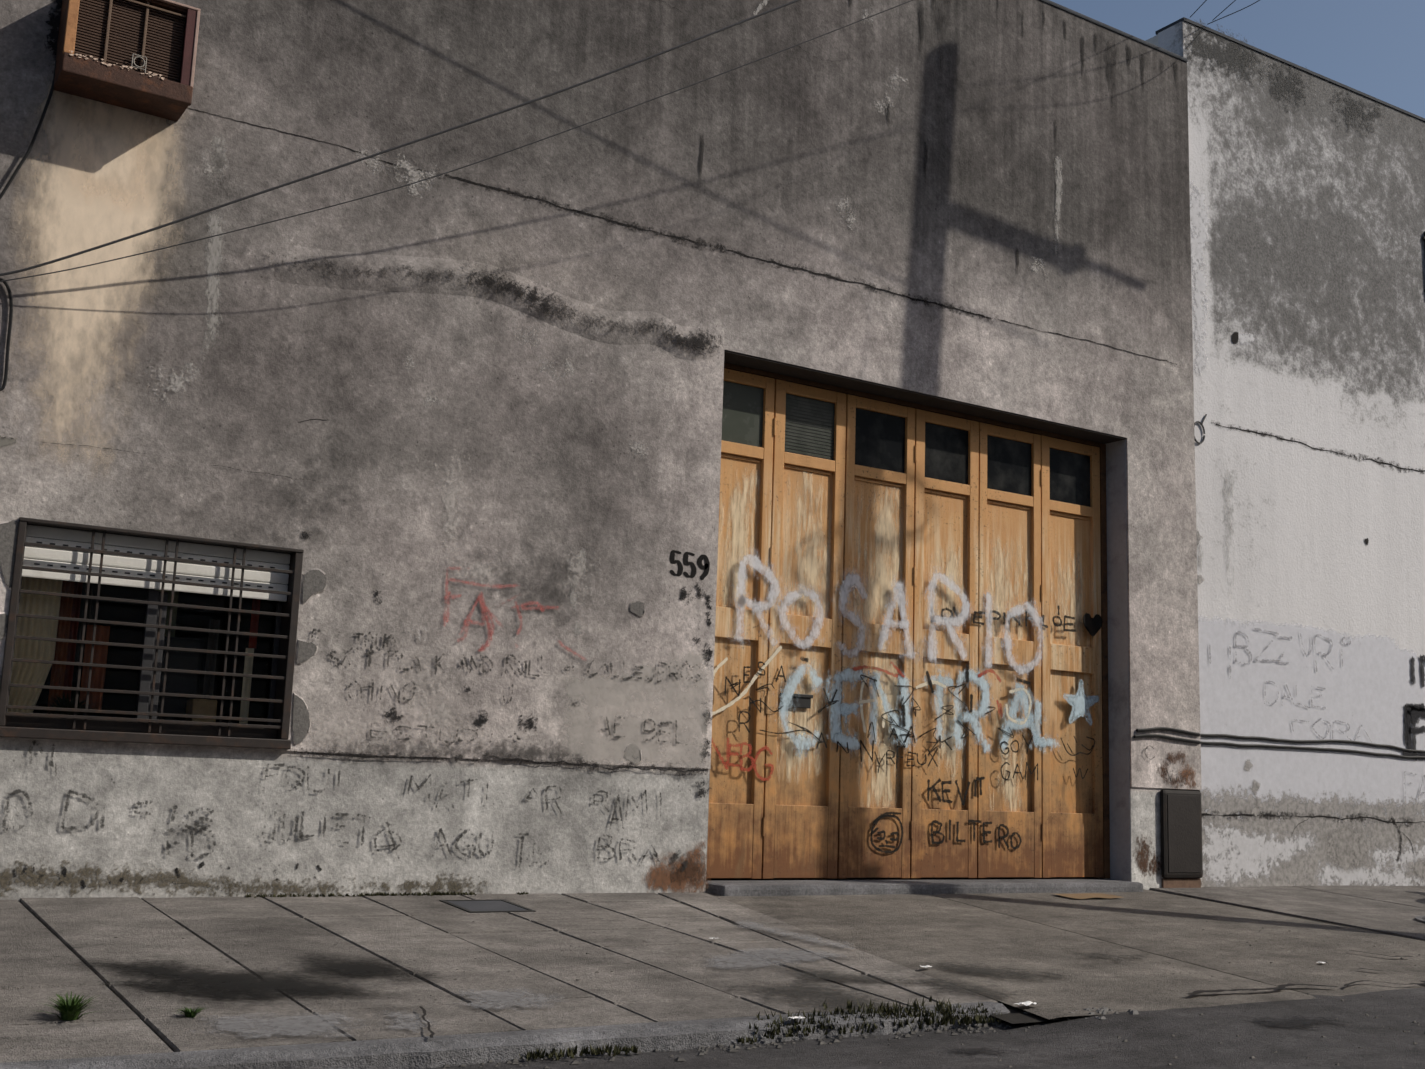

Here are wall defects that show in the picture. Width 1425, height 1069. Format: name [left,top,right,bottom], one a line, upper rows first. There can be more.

damp [1063,19,1311,112]
damp [1331,91,1384,136]
damp [29,91,171,430]
crack [187,107,1177,365]
crack [1211,422,1425,474]
corrosion [646,842,707,893]
flaking render [1201,760,1425,887]